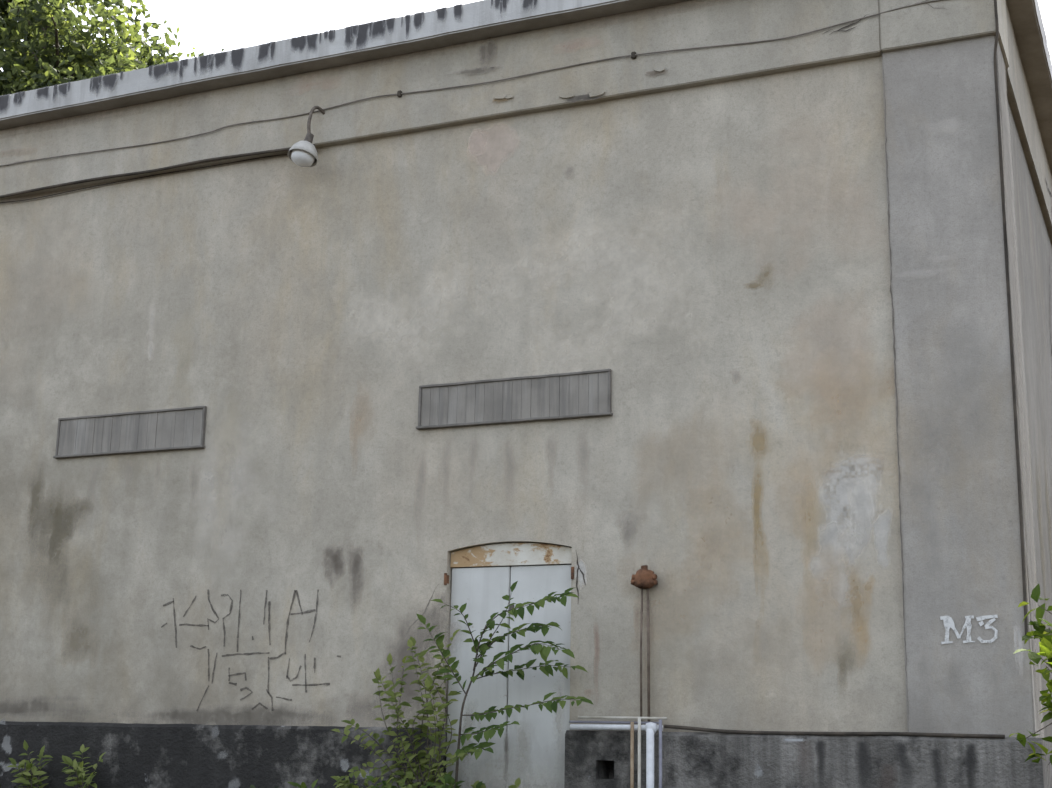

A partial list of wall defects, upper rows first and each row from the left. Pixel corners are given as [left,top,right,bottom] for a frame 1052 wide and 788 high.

water stain [0,82,71,113]
water stain [90,72,123,95]
corrosion [754,474,762,557]
water stain [30,478,89,597]
water stain [324,549,362,603]
water stain [0,697,55,715]
water stain [152,707,313,725]